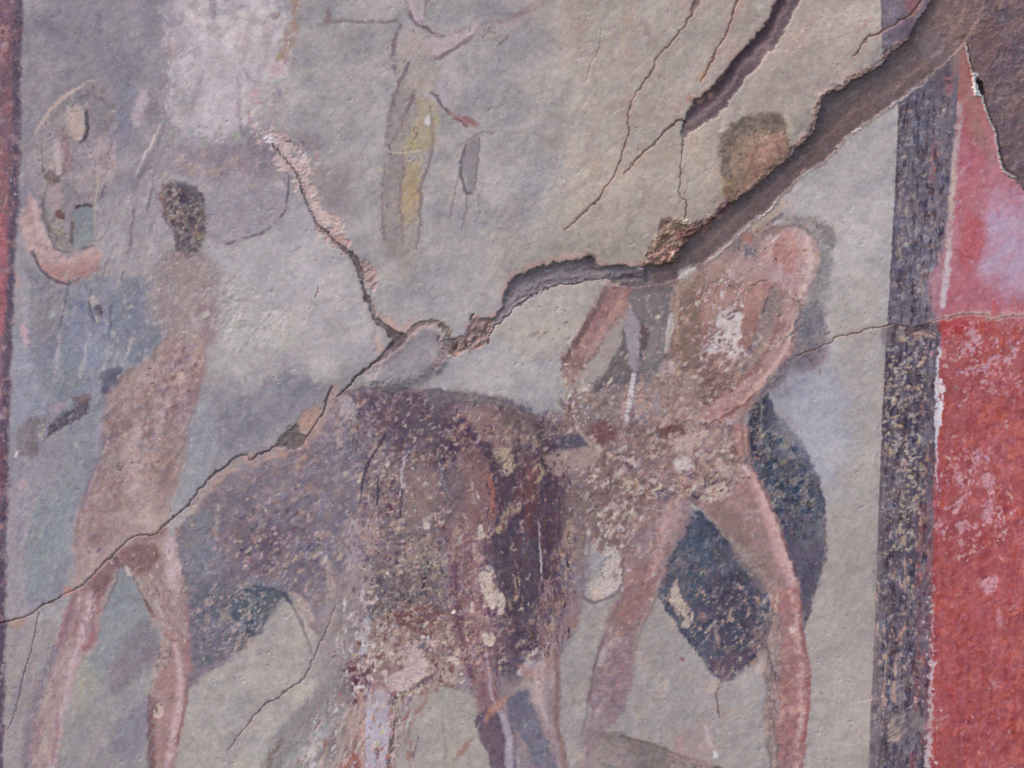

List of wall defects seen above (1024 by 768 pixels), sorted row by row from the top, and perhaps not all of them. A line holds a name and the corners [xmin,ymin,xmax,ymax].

crack [260,128,453,441]
spalling [445,318,493,358]
spalling [645,204,733,266]
crack [491,0,1024,328]
crack [798,313,1021,357]
crack [0,446,276,731]
crack [228,605,336,751]